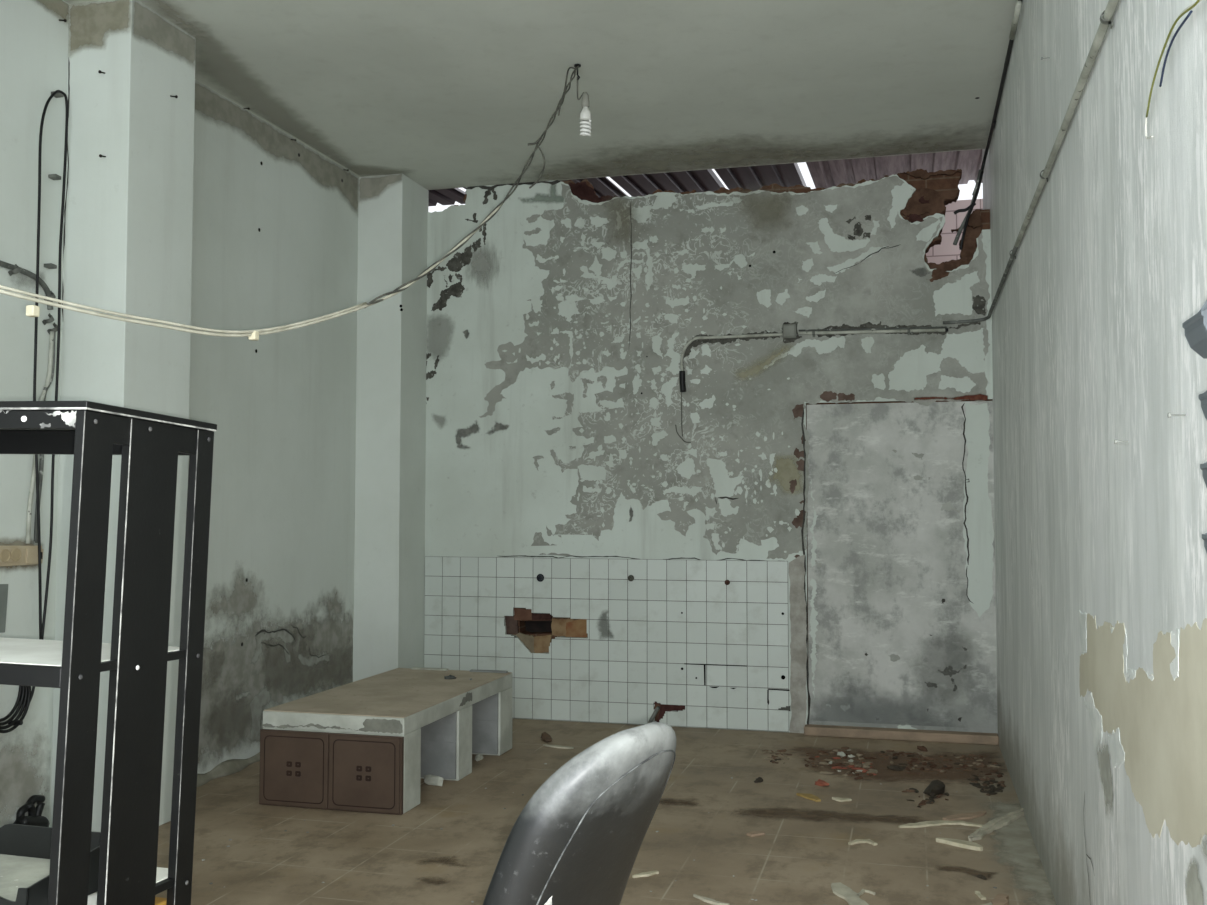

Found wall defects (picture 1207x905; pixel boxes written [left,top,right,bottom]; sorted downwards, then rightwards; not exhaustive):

water stain [37,0,196,63]
water stain [195,83,402,211]
flaking render [427,189,497,311]
flaking render [426,353,439,380]
peeling [479,169,990,712]
water stain [0,745,44,819]
water stain [198,577,353,763]
peeling [1079,610,1207,848]